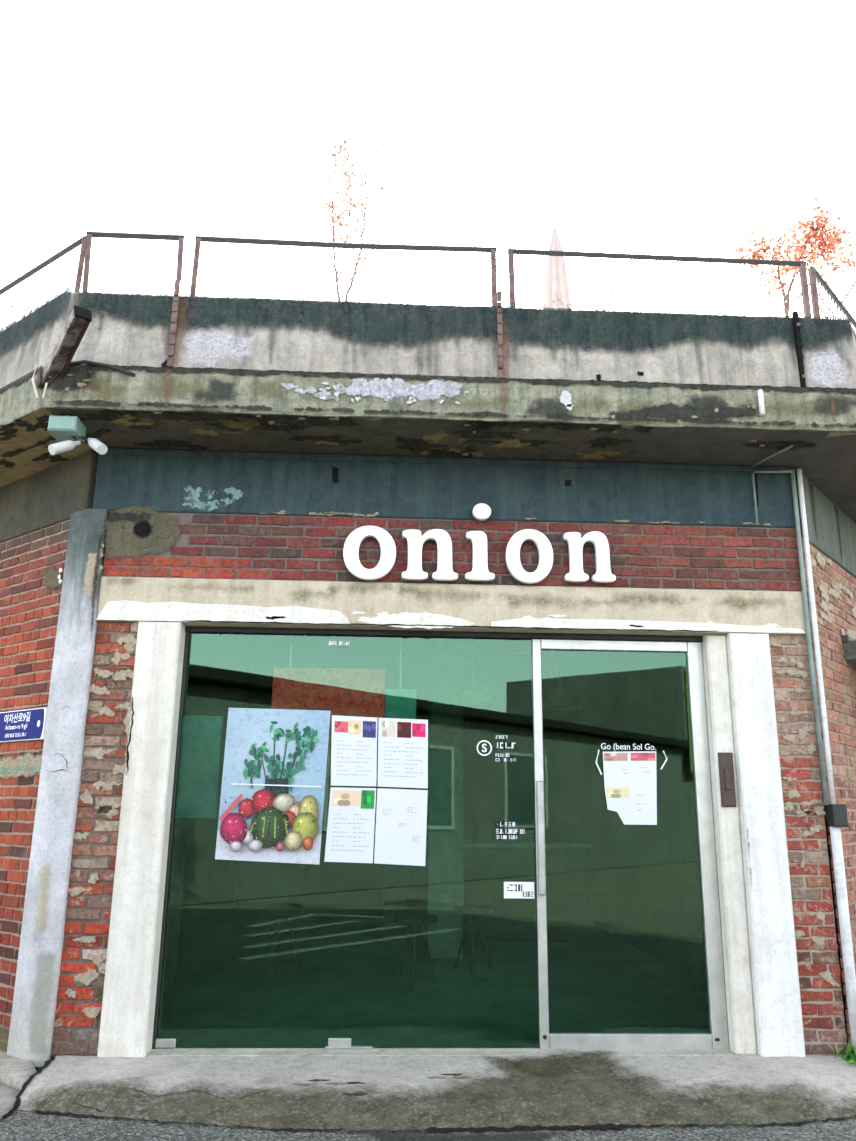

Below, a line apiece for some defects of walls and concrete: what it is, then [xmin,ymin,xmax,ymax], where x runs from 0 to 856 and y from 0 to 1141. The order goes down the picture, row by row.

water stain [0,284,856,387]
peeling [281,377,470,404]
peeling [182,485,244,511]
peeling [82,535,477,630]
peeling [491,615,806,634]
flaking render [123,696,134,774]
peeling [0,753,42,779]